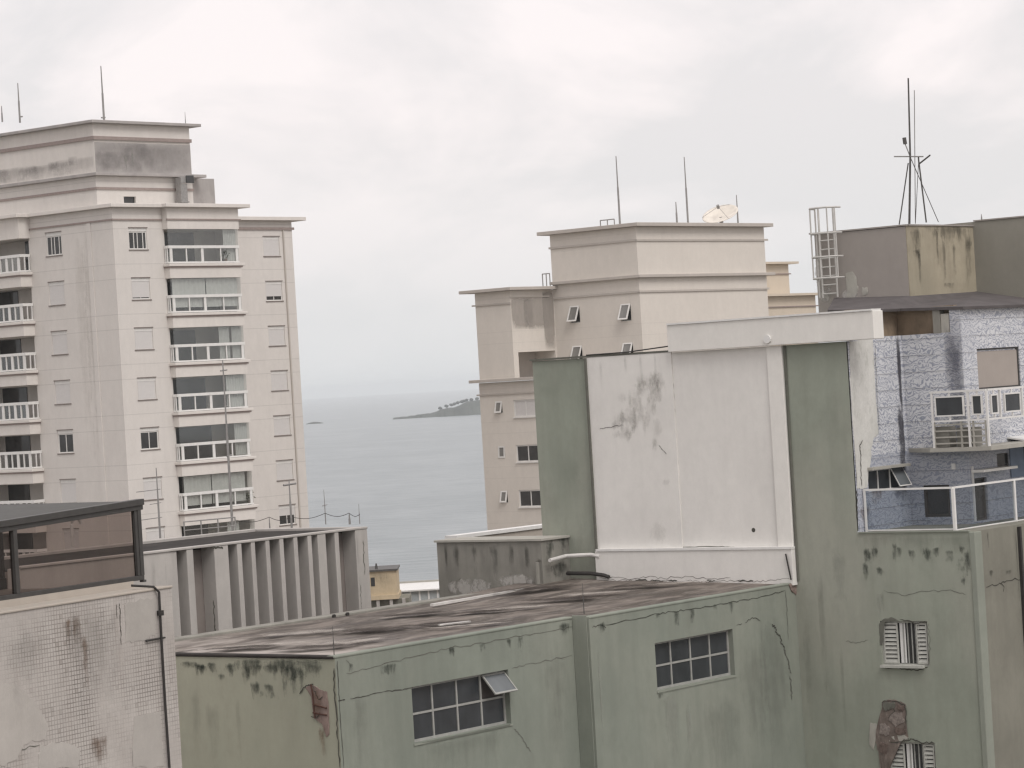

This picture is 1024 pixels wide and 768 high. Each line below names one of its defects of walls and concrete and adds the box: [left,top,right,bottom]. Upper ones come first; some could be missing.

water stain [511,292,554,344]
crack [884,578,1018,596]
water stain [205,575,700,690]
crack [333,576,792,766]
spalling [299,684,330,737]
spalling [869,699,933,768]